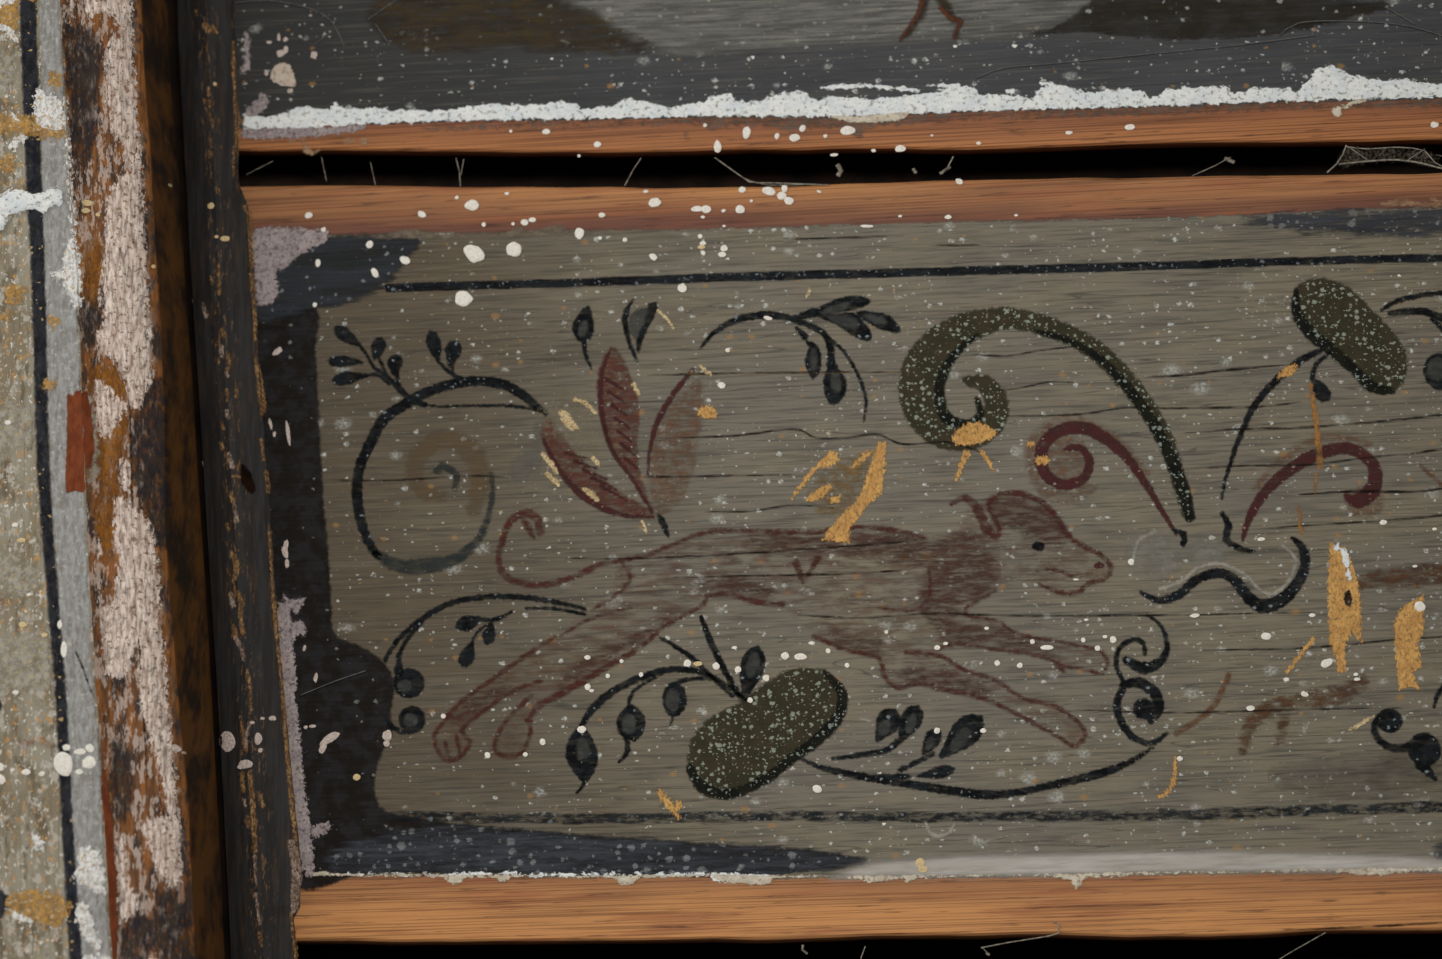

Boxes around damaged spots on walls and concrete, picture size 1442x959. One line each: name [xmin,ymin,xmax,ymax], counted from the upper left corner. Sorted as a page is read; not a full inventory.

water stain [820,83,961,93]
water stain [619,99,1442,138]
peeling [0,0,183,889]
peeling [218,328,241,530]
peeling [5,769,141,959]